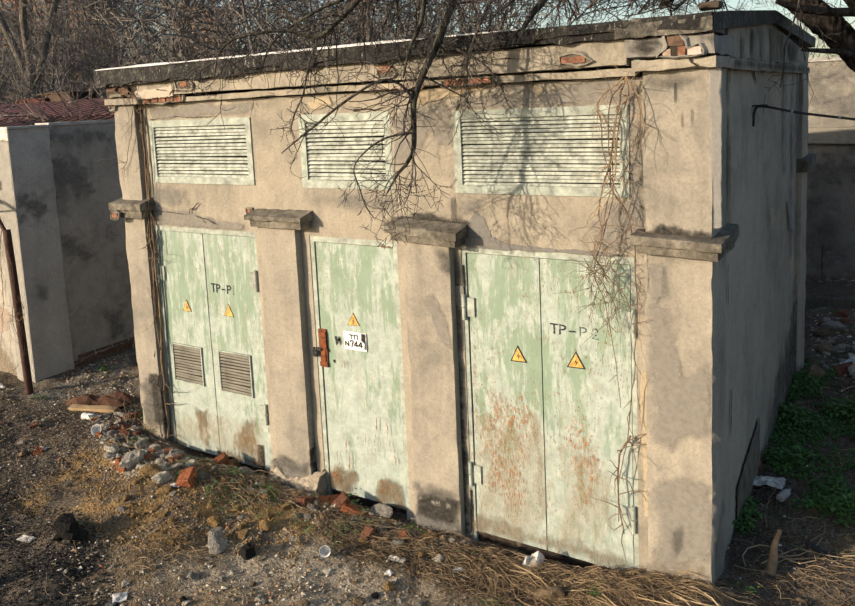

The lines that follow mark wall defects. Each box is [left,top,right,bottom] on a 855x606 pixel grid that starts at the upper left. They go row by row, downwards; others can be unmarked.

flaking render [656,34,707,59]
peeling [106,79,194,112]
peeling [369,66,501,104]
leakage [414,251,468,532]
rust [197,411,208,444]
rust [218,422,258,466]
rust [331,418,397,494]
rust [474,392,535,511]
rust [568,414,607,522]
rust [376,479,404,508]